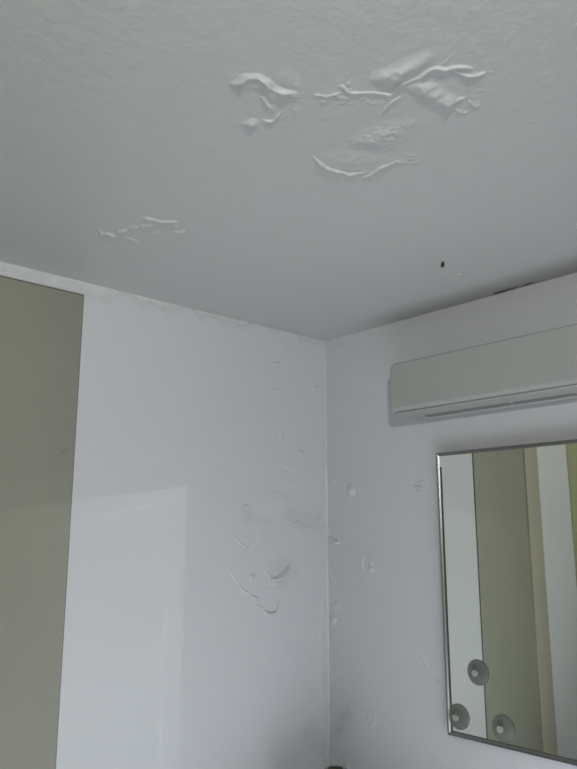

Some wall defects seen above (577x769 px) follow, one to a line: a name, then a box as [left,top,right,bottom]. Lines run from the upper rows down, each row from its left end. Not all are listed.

peeling [309,45,495,178]